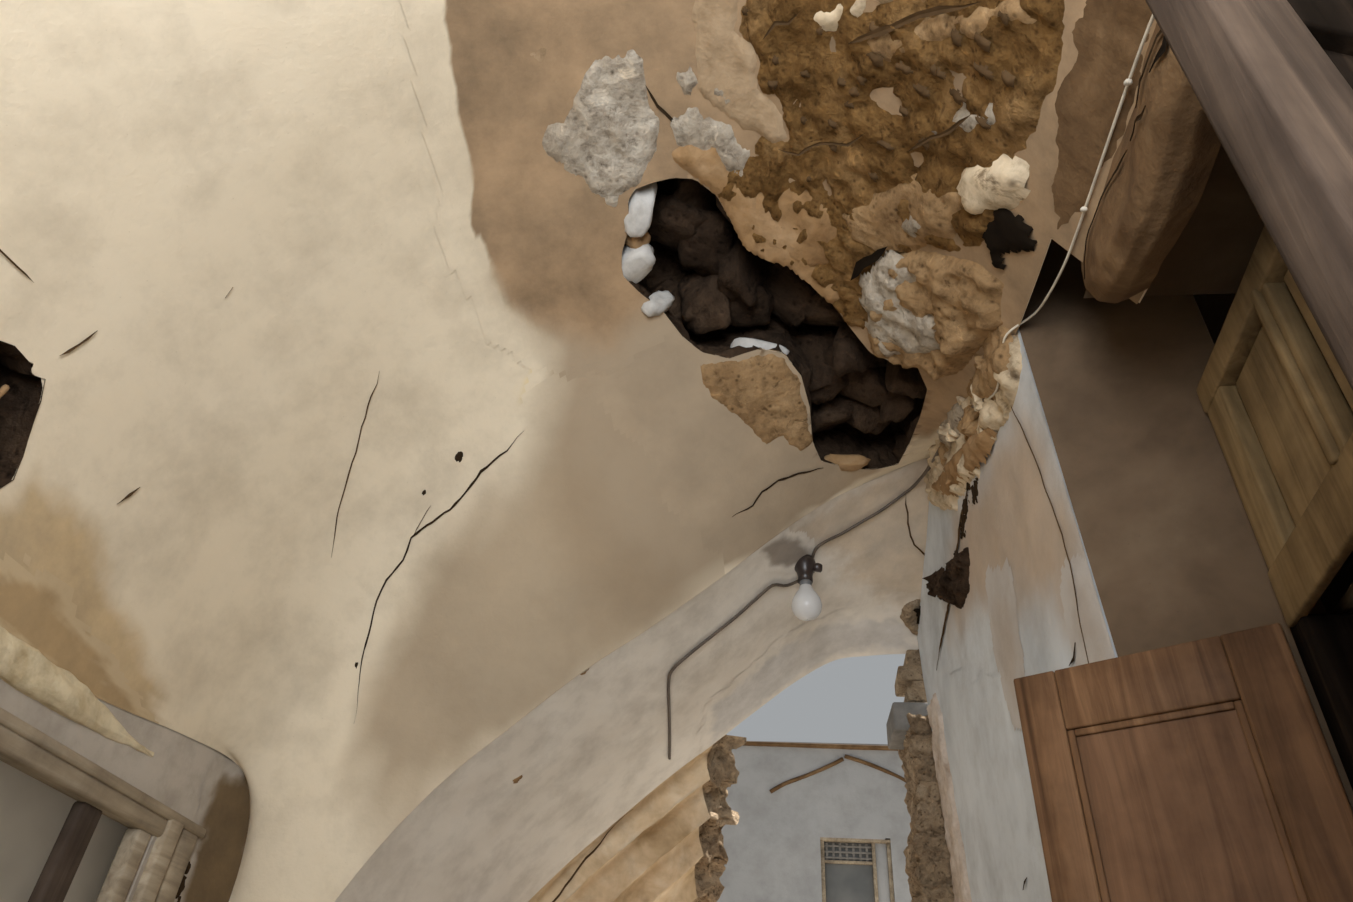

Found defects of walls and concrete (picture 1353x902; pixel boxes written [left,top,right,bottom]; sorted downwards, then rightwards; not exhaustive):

flaking render [400,0,1157,511]
crack [1083,29,1167,279]
crack [331,375,379,556]
crack [354,438,517,722]
flaking render [894,547,972,902]